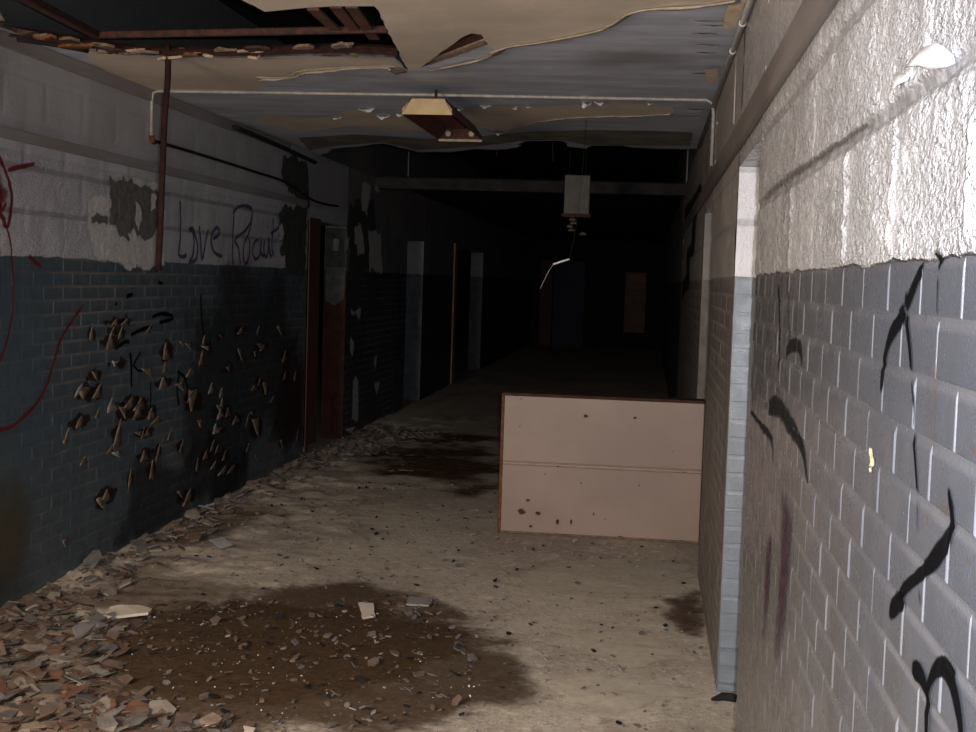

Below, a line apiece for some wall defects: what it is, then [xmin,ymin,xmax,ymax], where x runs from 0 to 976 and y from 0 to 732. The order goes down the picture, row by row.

peeling [9,0,747,94]
spalling [87,176,166,270]
peeling [62,314,184,510]
peeling [141,325,303,476]